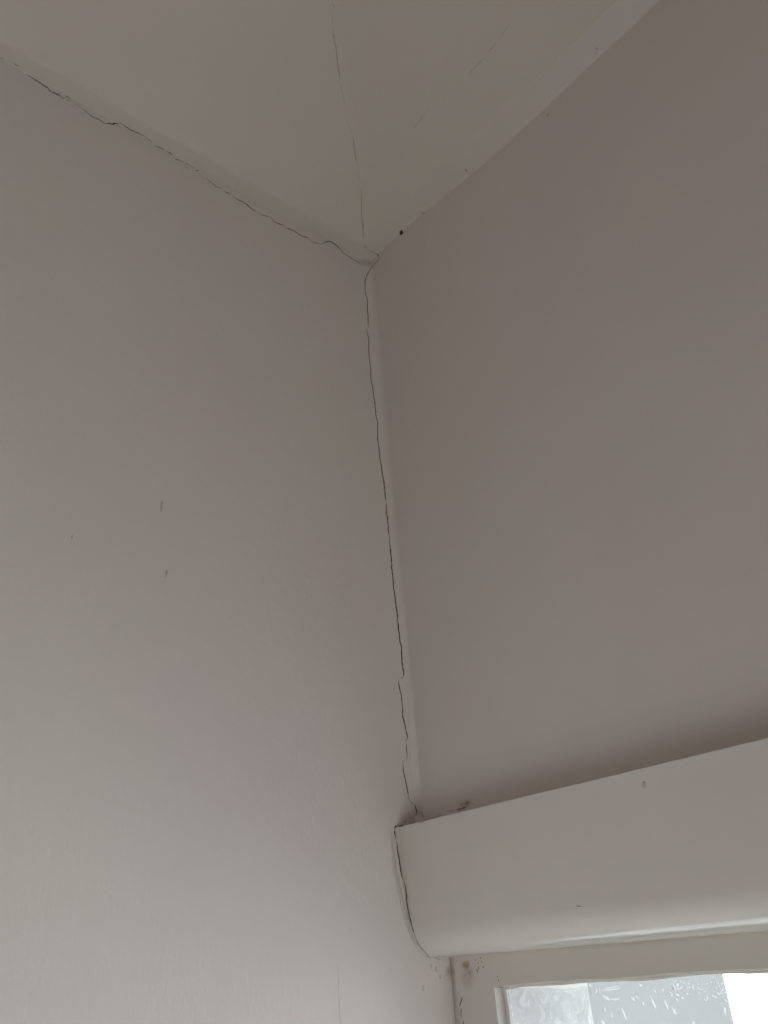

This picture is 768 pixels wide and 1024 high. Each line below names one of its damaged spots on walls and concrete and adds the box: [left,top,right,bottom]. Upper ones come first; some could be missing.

crack [1,3,454,960]